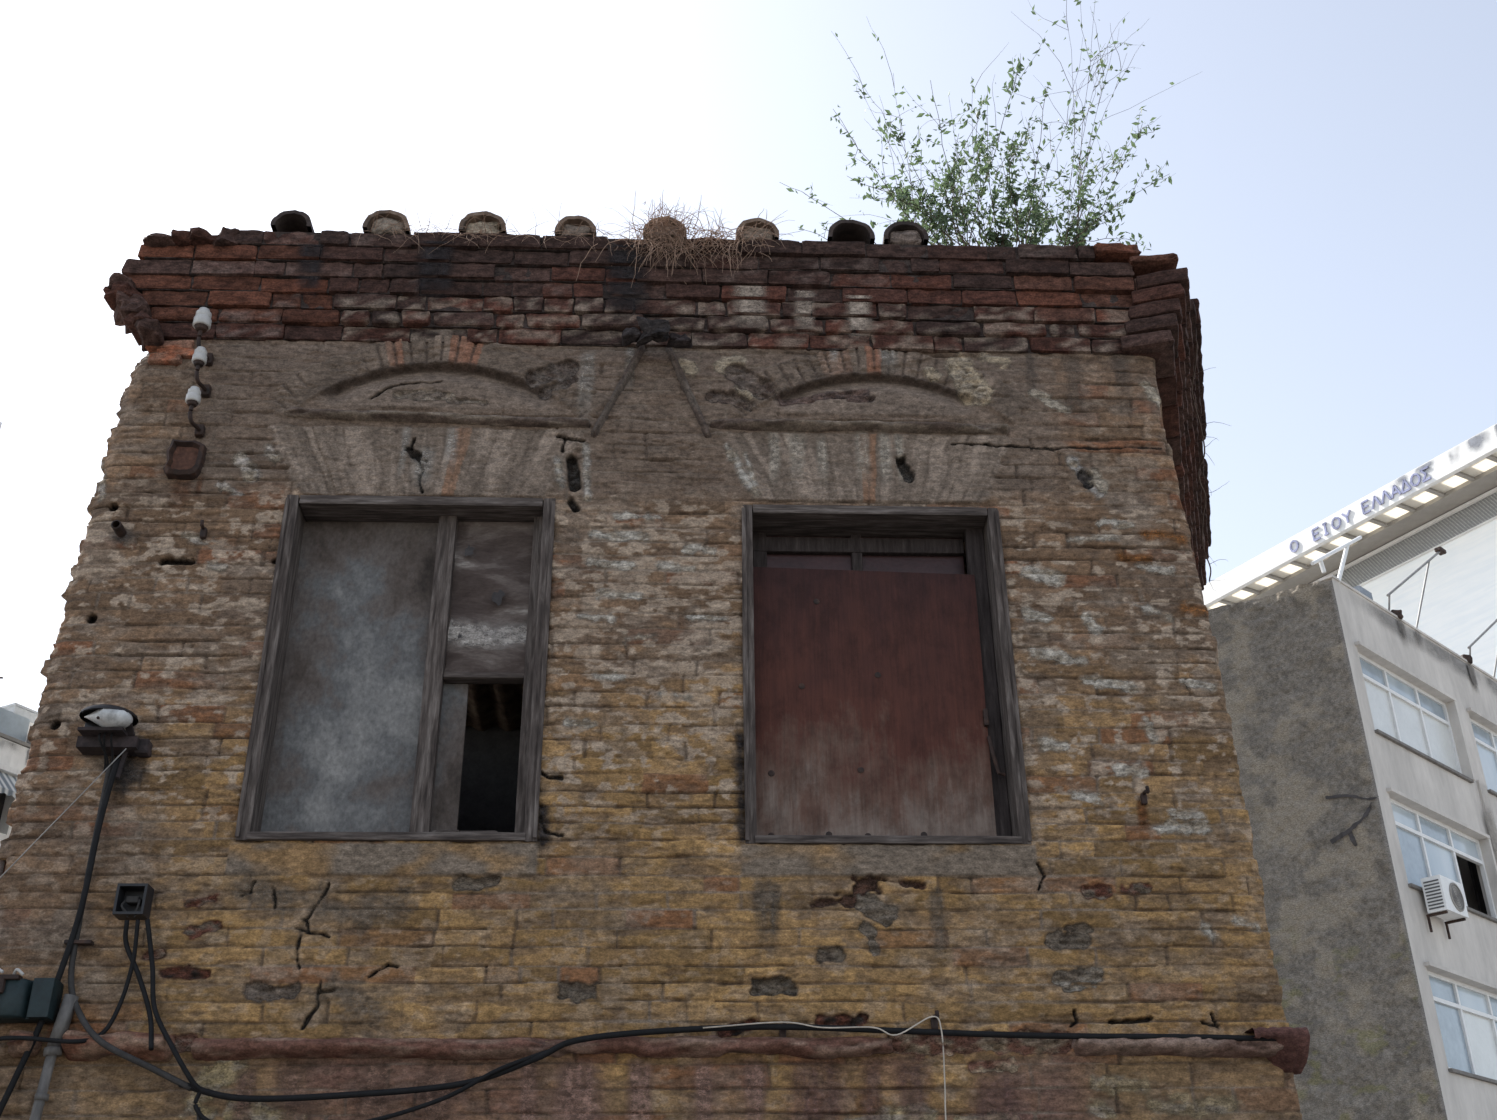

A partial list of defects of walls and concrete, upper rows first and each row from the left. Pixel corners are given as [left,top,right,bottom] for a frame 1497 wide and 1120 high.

crack [411,439,427,494]
spalling [811,876,925,956]
crack [244,882,330,1030]
spalling [817,946,846,963]
spalling [558,981,598,1004]
spalling [750,976,798,996]